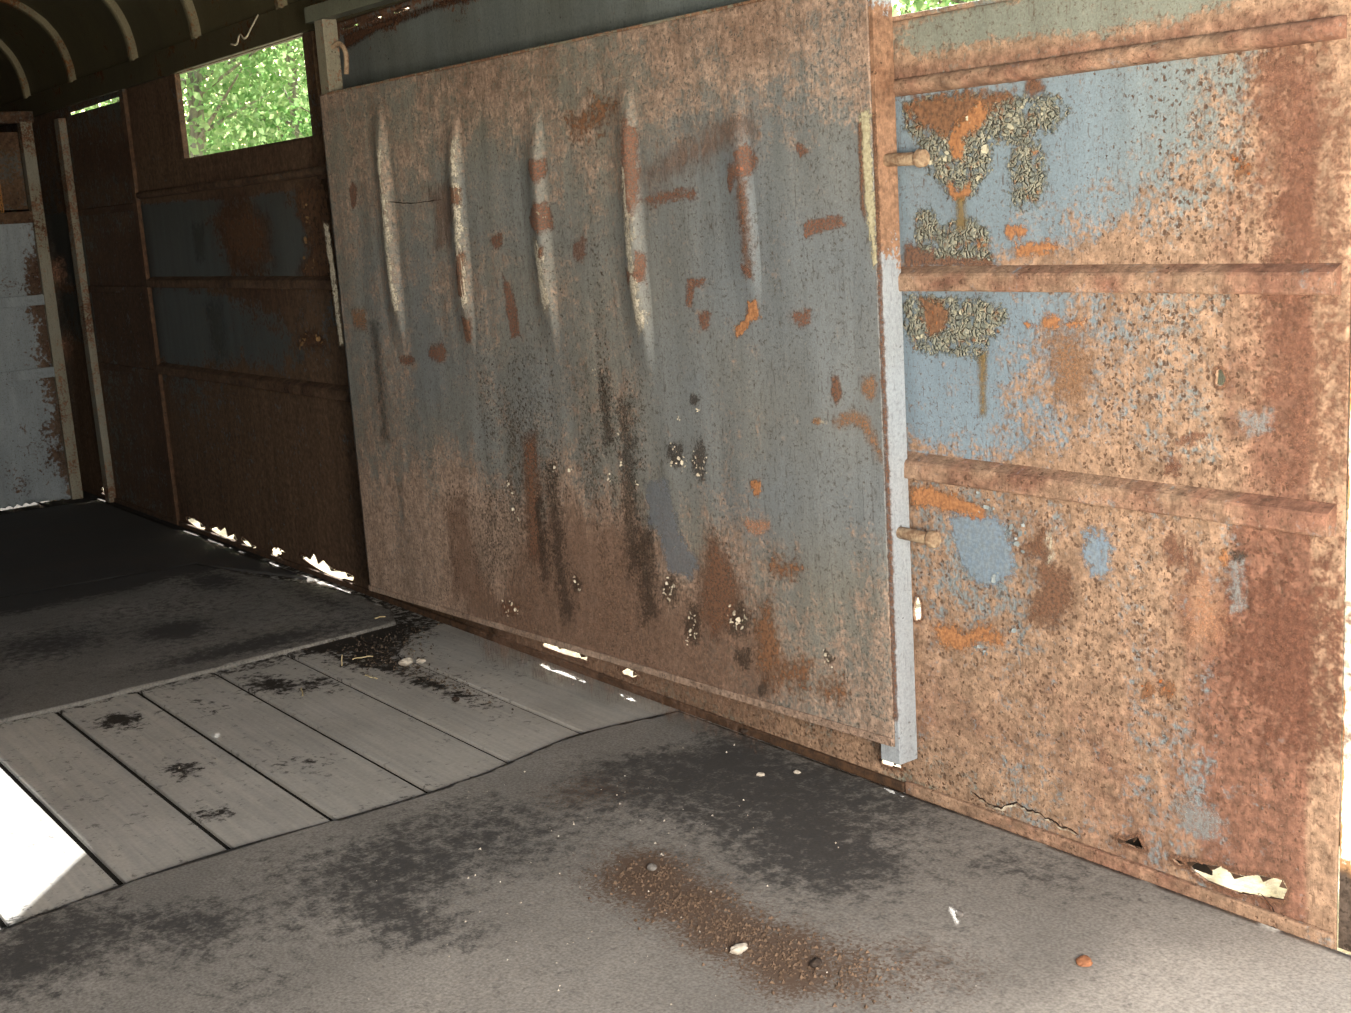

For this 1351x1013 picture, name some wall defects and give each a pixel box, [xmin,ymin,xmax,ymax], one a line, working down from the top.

rust [343,0,469,48]
rust [734,299,762,337]
peeling [902,294,1008,414]
peeling [902,85,1070,261]
rust [1005,224,1058,258]
rust [1223,41,1351,264]
rust [1243,282,1351,503]
rust [507,433,574,624]
rust [592,369,659,627]
rust [701,536,852,707]
rust [1163,531,1351,798]
crack [971,791,1078,836]